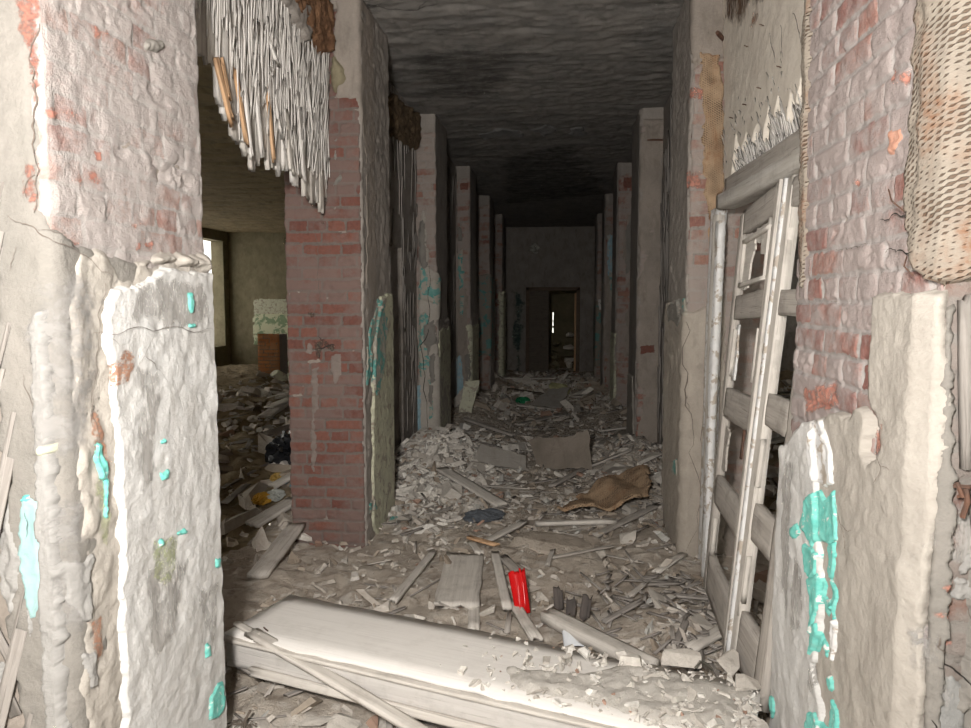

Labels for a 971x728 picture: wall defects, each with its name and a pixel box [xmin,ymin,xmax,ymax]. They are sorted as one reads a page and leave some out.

peeling [277,0,313,42]
water stain [388,92,422,151]
spalling [887,129,903,155]
peeling [187,292,196,328]
peeling [417,220,441,430]
peeling [456,355,464,394]
peeling [93,442,110,519]
peeling [789,382,839,661]
peeling [0,495,96,636]
peeling [945,577,971,600]
peeling [209,681,226,720]
peeling [804,675,840,728]